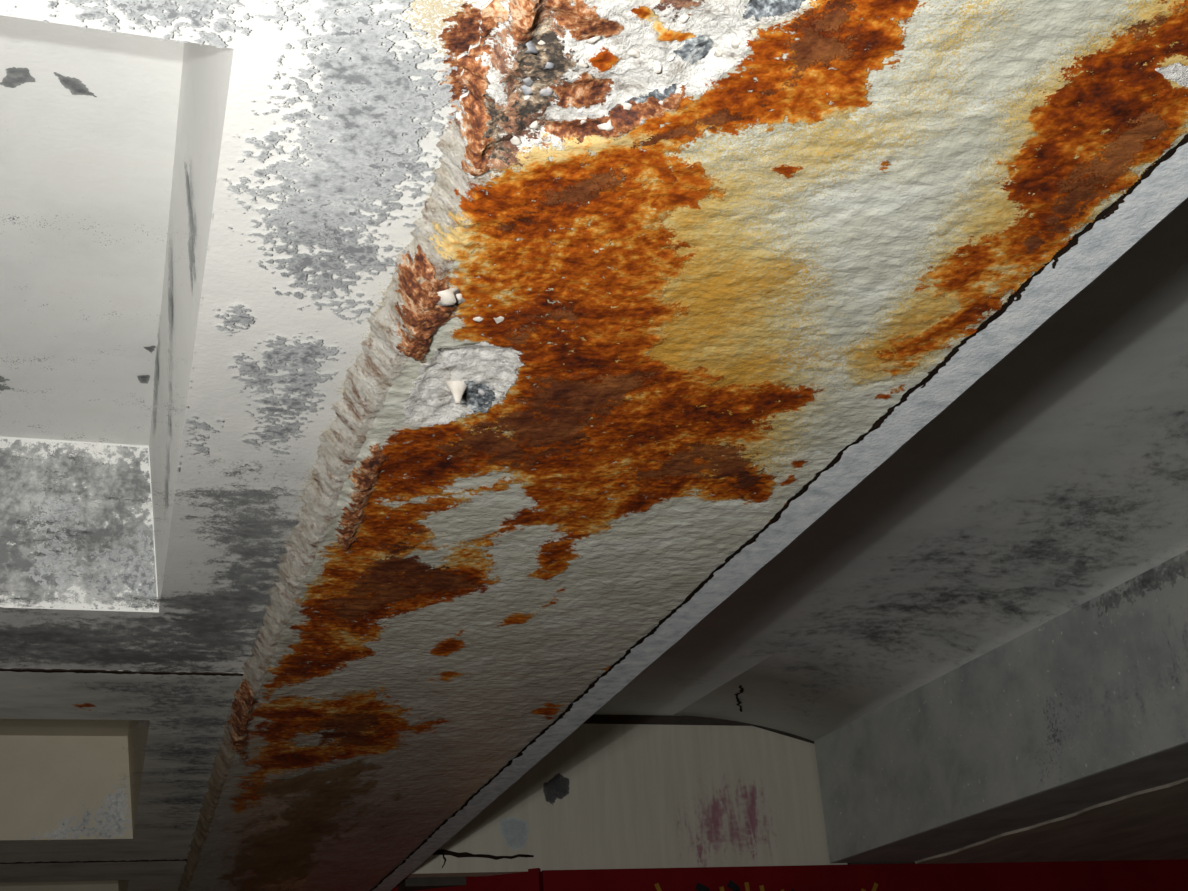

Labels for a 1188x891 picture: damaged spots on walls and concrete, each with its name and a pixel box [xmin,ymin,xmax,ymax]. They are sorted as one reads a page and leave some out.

peeling [0,67,35,88]
damp [398,0,481,76]
peeling [43,0,805,324]
damp [0,153,318,832]
peeling [178,406,224,472]
peeling [213,305,254,336]
peeling [228,331,345,461]
spalling [402,341,526,427]
rust [225,0,1188,814]
crack [370,133,1188,891]
damp [670,388,1188,731]